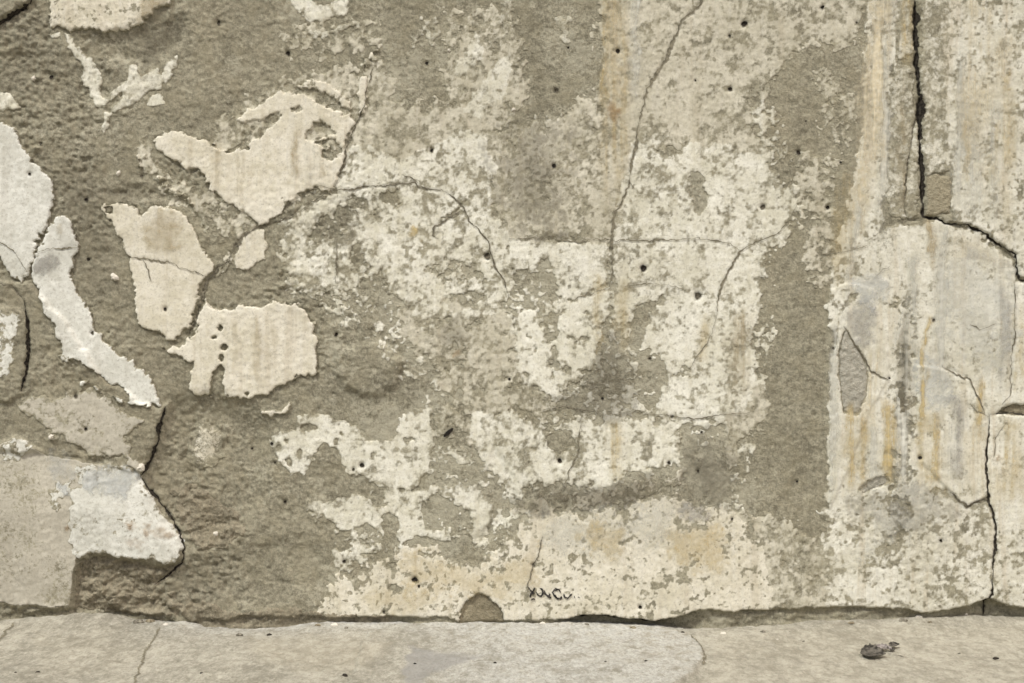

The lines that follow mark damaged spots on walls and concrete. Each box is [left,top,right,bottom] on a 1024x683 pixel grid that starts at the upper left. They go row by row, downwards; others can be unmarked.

peeling [0,92,21,112]
peeling [0,122,161,408]
peeling [48,0,178,134]
crack [131,0,795,368]
peeling [101,0,1024,532]
crack [902,2,1024,614]
peeling [0,438,33,462]
crack [140,406,185,584]
peeling [16,385,1024,629]